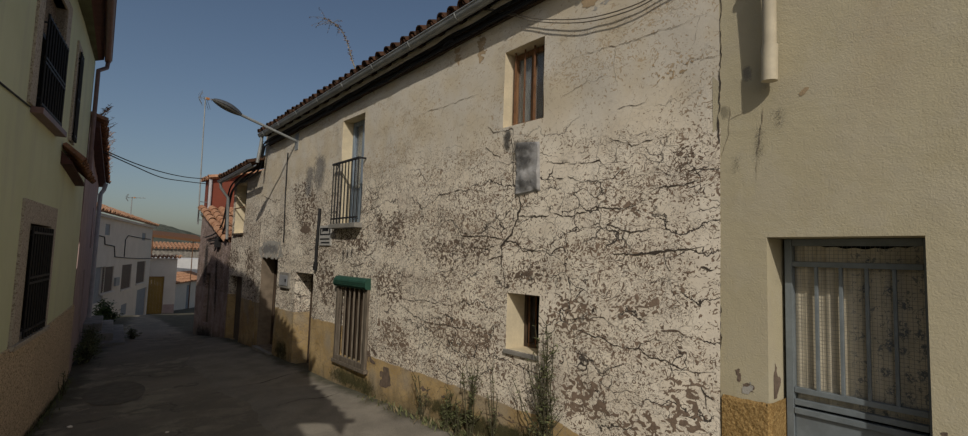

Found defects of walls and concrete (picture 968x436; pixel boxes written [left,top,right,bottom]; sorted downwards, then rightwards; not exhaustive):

crack [562,0,763,178]
crack [394,298,487,343]
crack [455,127,722,350]
crack [563,317,722,430]